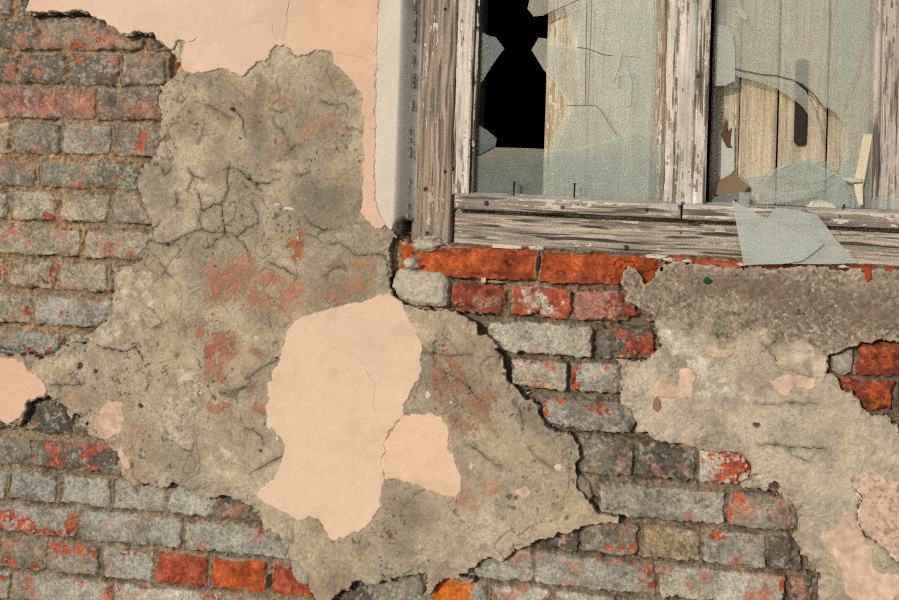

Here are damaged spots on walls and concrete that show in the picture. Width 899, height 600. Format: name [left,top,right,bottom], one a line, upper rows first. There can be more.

peeling [421,15,446,87]
peeling [442,0,899,251]
crack [155,169,302,275]
peeling [0,163,782,600]
peeling [770,337,899,437]
spalling [691,451,826,600]